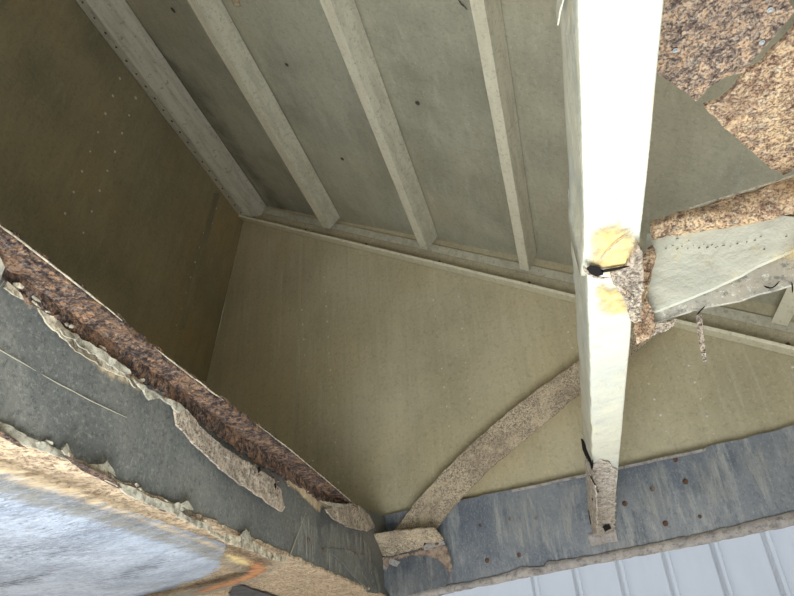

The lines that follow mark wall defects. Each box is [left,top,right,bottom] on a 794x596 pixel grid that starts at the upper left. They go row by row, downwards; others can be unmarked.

spalling [556,0,564,25]
peeling [0,257,290,512]
peeling [0,422,288,563]
spalling [581,439,618,535]